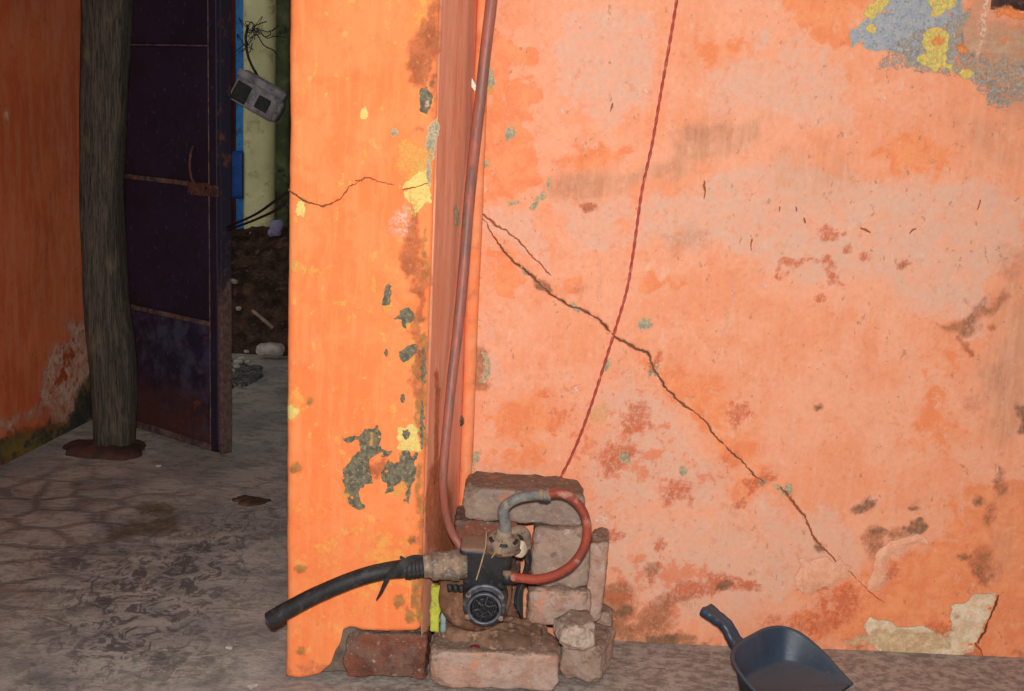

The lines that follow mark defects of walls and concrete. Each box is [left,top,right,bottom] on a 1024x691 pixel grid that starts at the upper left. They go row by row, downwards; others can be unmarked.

peeling [850,0,1001,103]
crack [288,177,427,208]
leakage [0,319,92,444]
peeling [341,334,429,514]
crack [483,213,885,603]
flaking render [845,592,996,656]